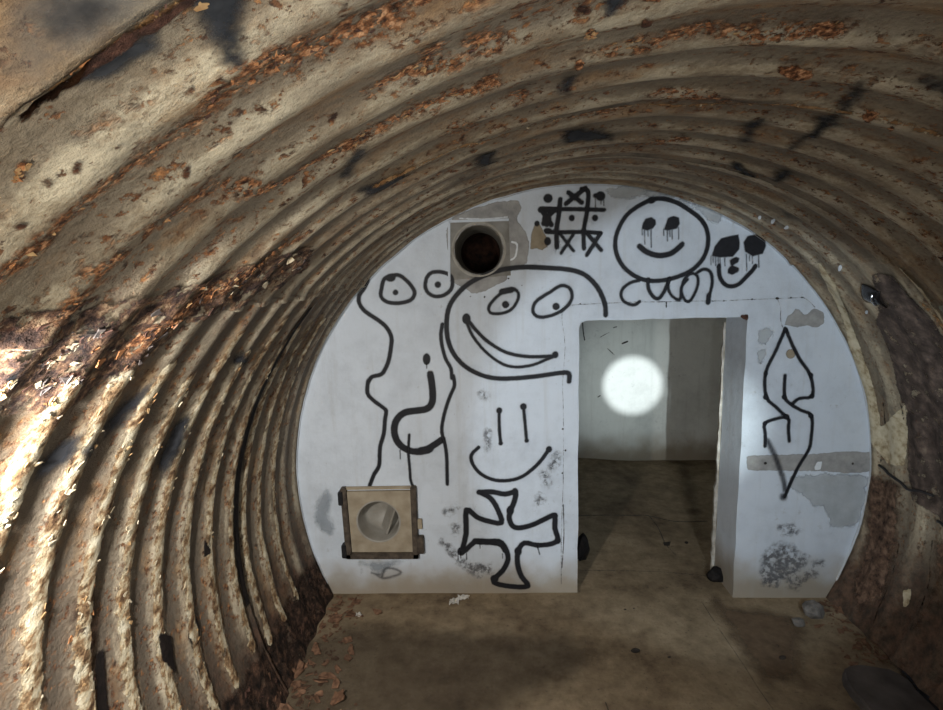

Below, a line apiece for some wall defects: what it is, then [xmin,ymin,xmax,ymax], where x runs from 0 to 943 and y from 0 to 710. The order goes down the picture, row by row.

rust [359,30,504,101]
rust [584,19,847,58]
rust [0,0,432,284]
rust [147,74,501,234]
rust [0,230,313,416]
peeling [747,263,943,527]
leakage [762,546,823,588]
rust [854,475,901,612]
peeling [903,589,911,607]